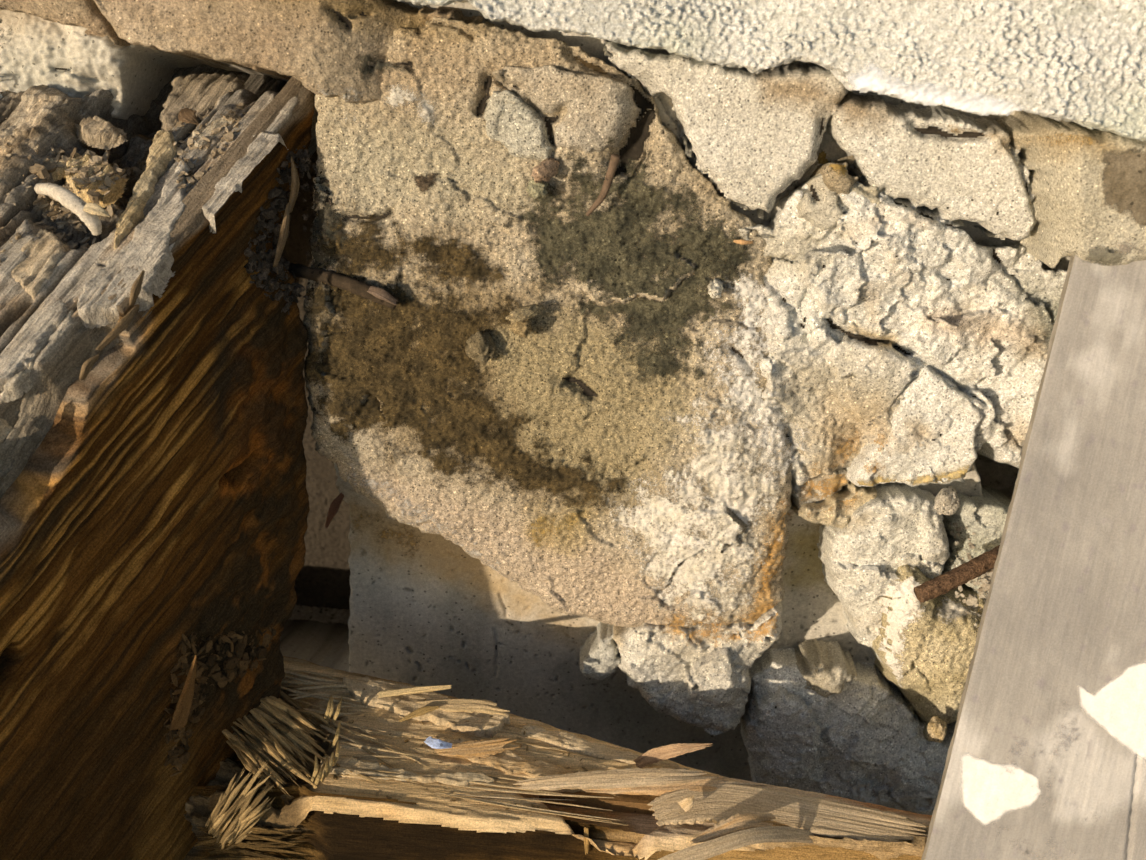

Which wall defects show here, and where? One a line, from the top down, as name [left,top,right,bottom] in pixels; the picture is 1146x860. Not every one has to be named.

crack [334,11,367,29]
crack [371,60,412,68]
crack [574,56,607,74]
crack [477,76,517,116]
crack [544,115,558,144]
crack [614,86,656,177]
crack [915,126,984,139]
crack [810,185,820,201]
crack [345,211,391,220]
spalling [738,181,1067,508]
water stain [303,138,809,634]
peeling [580,622,621,680]